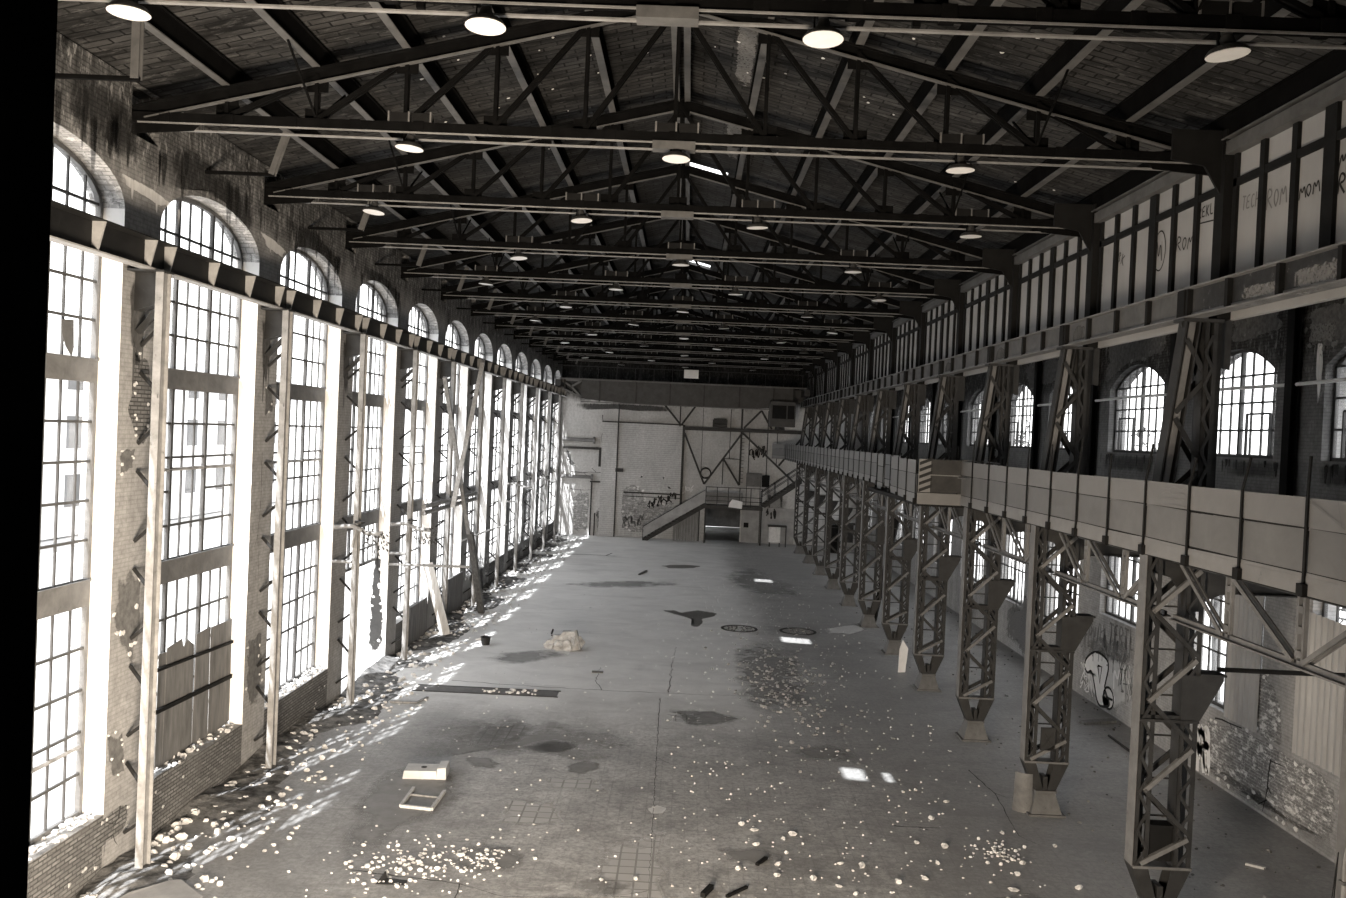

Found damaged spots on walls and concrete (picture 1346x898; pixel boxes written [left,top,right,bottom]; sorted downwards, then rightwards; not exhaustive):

damp [55,80,340,290]
spalling [1198,674,1339,842]